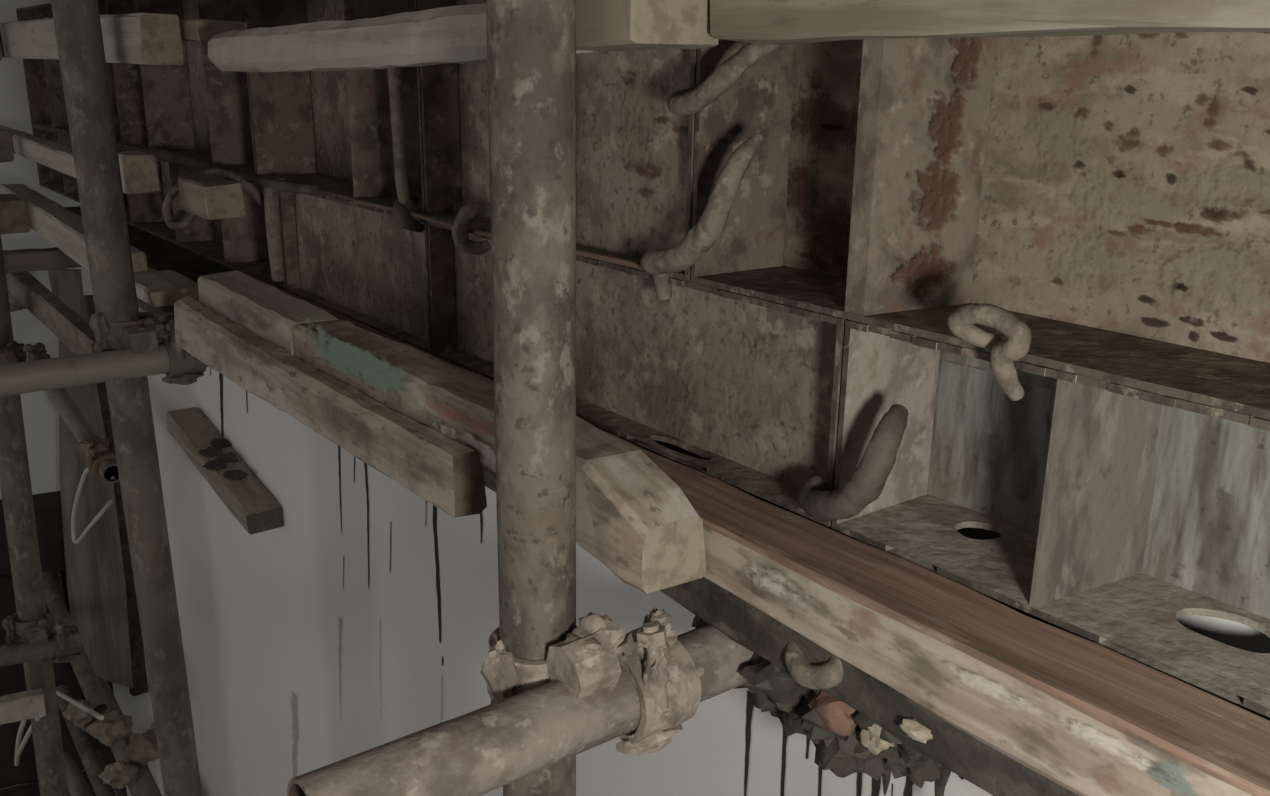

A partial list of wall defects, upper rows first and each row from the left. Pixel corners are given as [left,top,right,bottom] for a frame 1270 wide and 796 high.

rust [1198,96,1257,172]
rust [788,72,858,279]
rust [1110,198,1270,238]
rust [1140,297,1238,343]
damp [338,445,369,589]
damp [425,505,443,666]
damp [744,690,754,796]
damp [806,737,822,796]
spalling [860,724,894,755]
damp [857,773,914,796]
spalling [898,717,933,744]